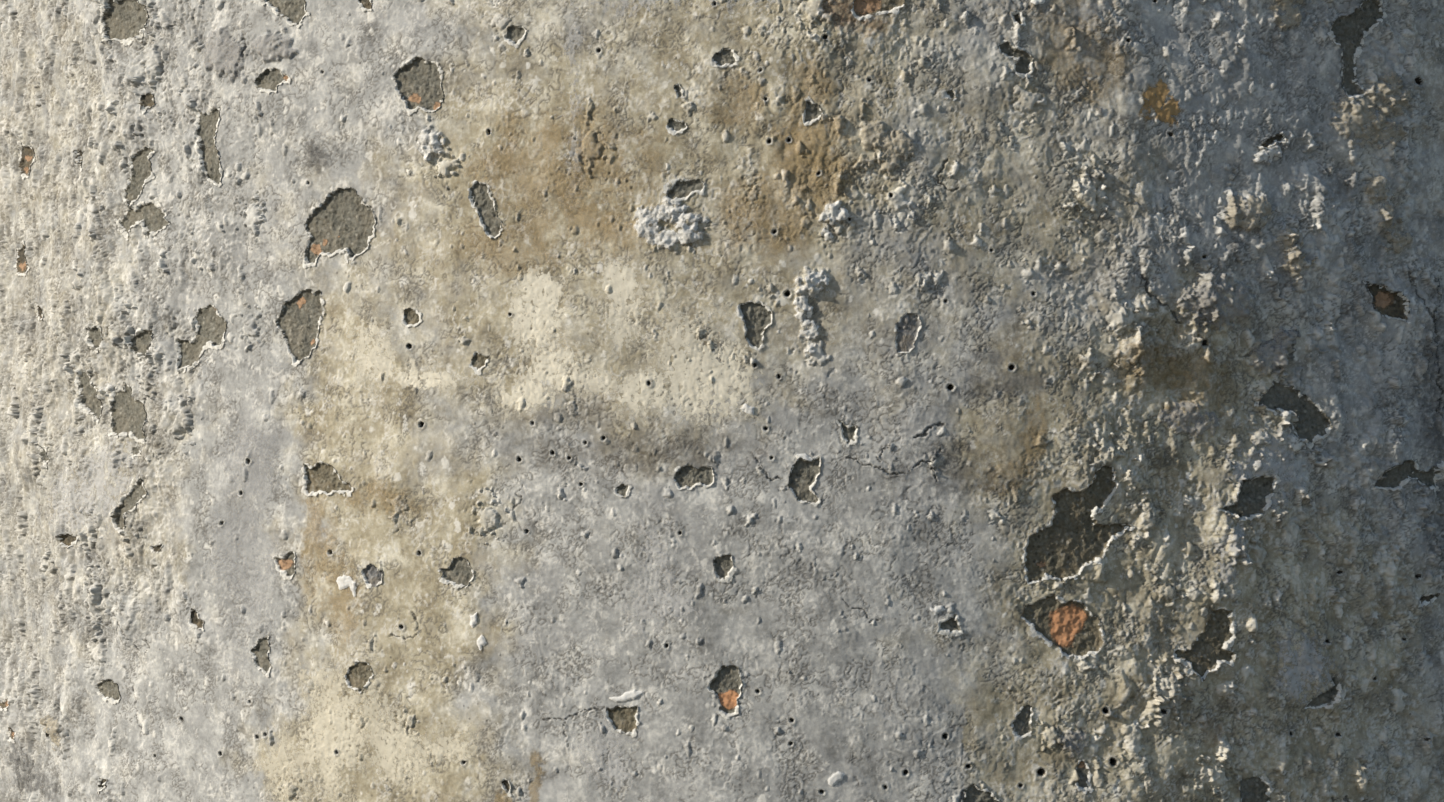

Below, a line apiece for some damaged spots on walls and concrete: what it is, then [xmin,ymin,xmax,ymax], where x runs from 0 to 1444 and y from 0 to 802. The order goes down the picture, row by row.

spalling [100,0,148,46]
spalling [391,56,444,115]
spalling [191,106,223,189]
spalling [302,186,376,268]
spalling [174,304,227,373]
spalling [275,289,325,367]
spalling [301,460,354,498]
spalling [788,453,821,507]
spalling [1217,474,1281,521]
spalling [1021,463,1135,661]
spalling [1173,607,1237,682]
spalling [707,665,743,719]